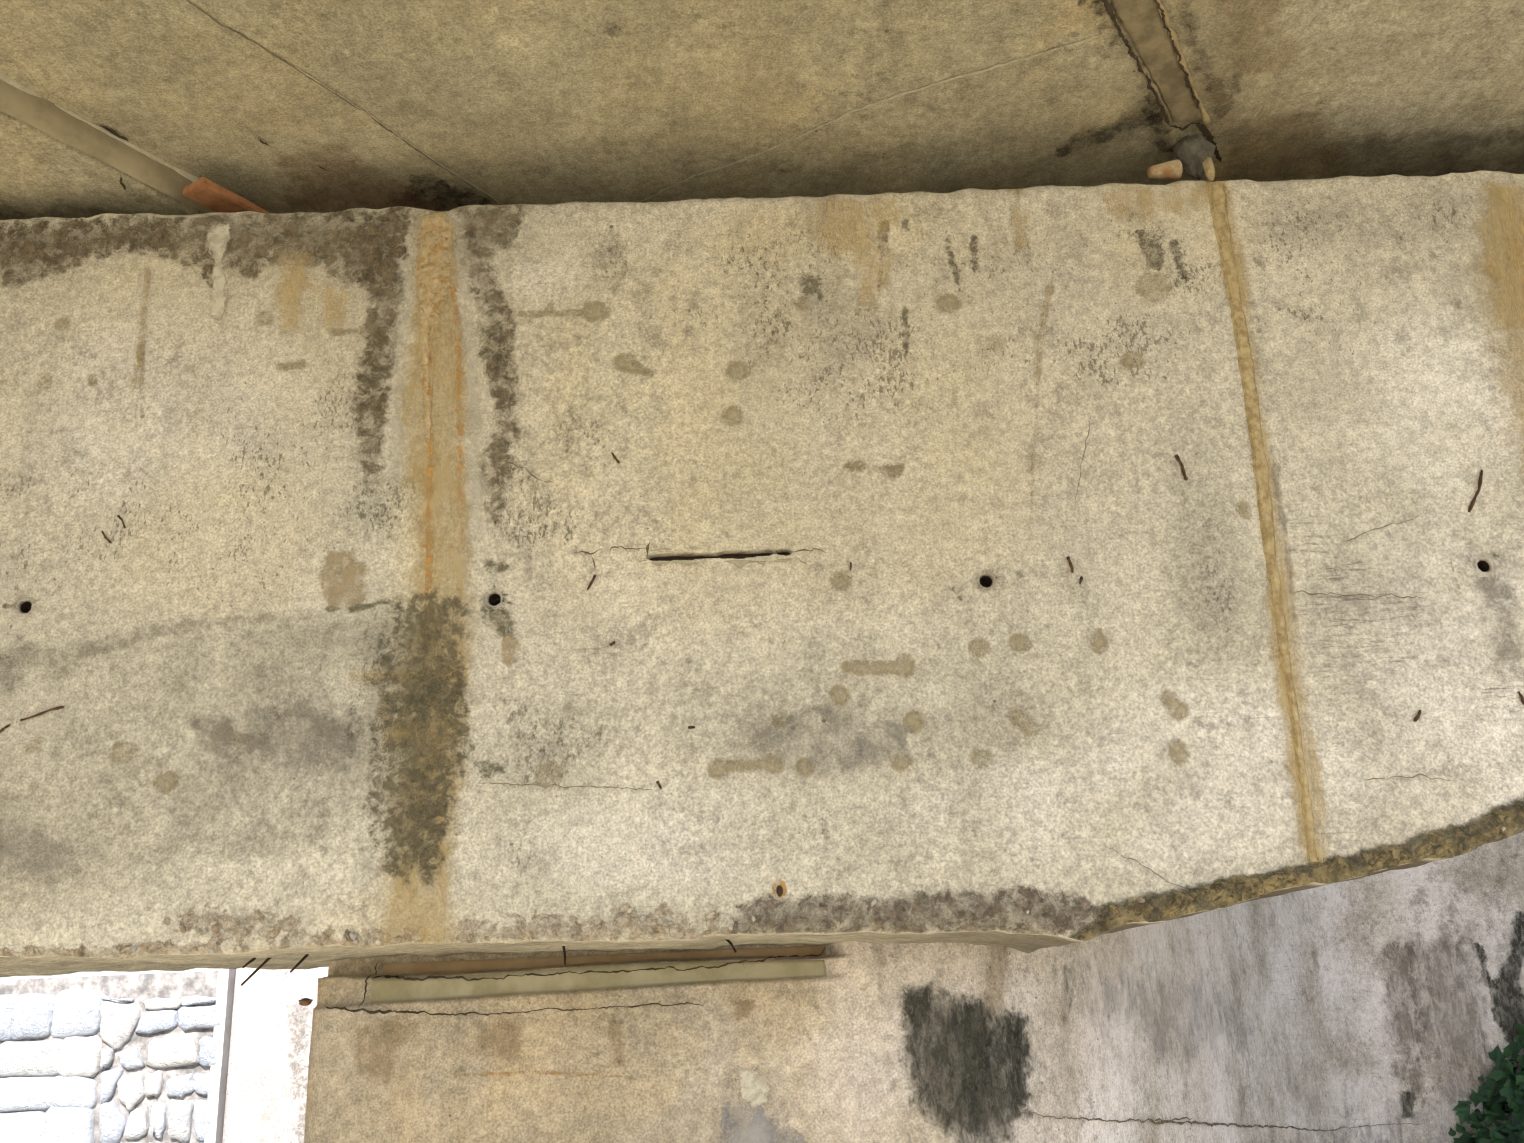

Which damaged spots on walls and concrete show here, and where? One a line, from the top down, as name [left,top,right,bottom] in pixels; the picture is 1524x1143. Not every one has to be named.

damp [1055,95,1173,157]
damp [1180,3,1241,119]
damp [0,177,583,541]
corrosion [374,247,466,945]
crack [574,542,827,571]
damp [212,551,602,885]
crack [325,946,826,1016]
damp [899,986,1033,1143]